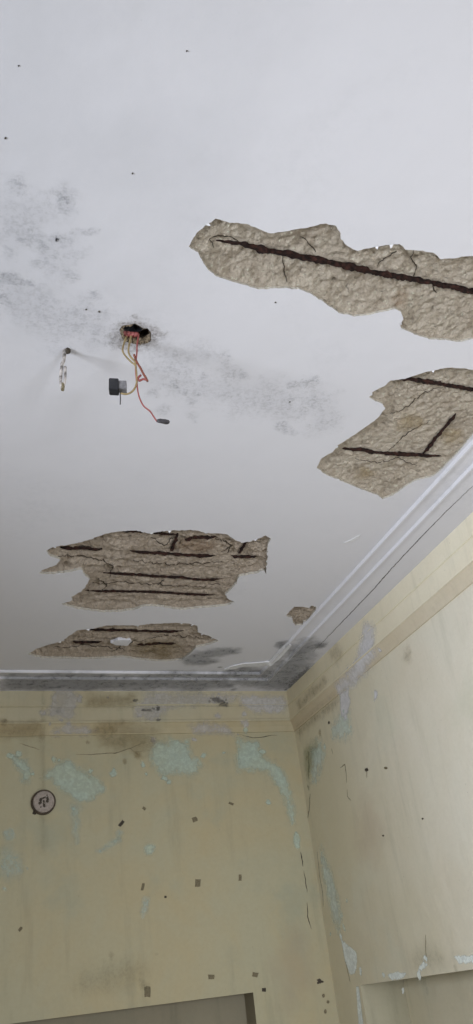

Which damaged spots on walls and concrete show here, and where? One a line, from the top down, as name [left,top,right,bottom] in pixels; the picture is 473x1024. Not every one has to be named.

flaking render [189,219,473,342]
flaking render [317,367,473,499]
flaking render [40,530,271,612]
flaking render [29,623,218,661]
water stain [6,642,324,721]
flaking render [286,605,316,626]
crack [300,852,323,927]